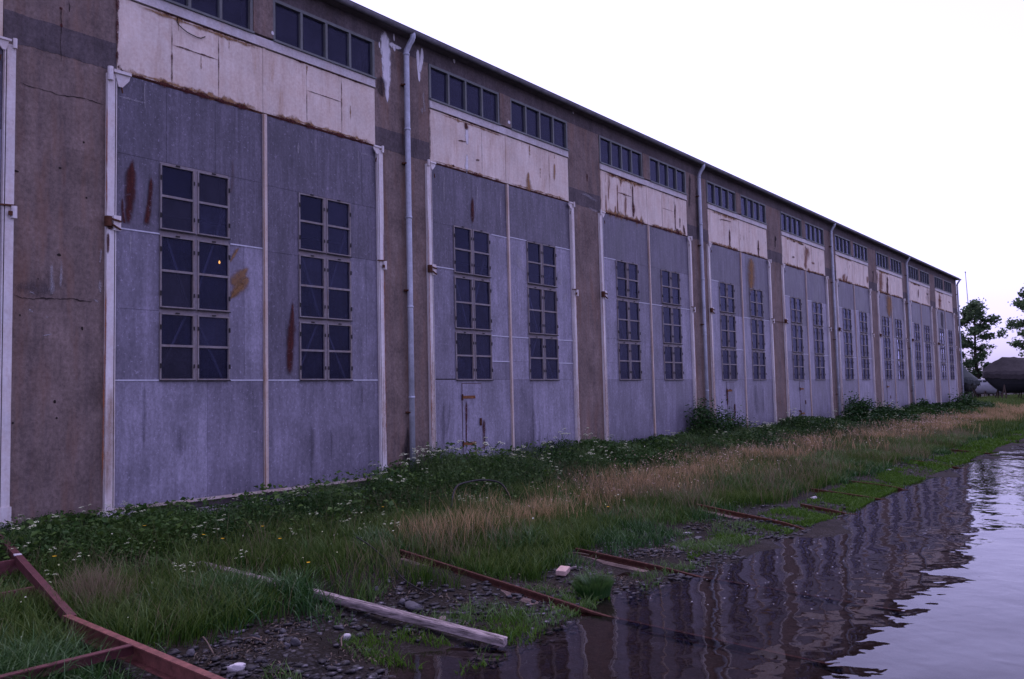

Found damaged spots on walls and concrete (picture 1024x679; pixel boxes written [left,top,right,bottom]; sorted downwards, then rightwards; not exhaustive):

corrosion [116,0,254,110]
crack [24,84,101,104]
corrosion [290,57,362,119]
corrosion [275,115,368,144]
corrosion [145,178,153,224]
corrosion [600,173,685,236]
corrosion [230,248,249,298]
corrosion [287,303,295,372]